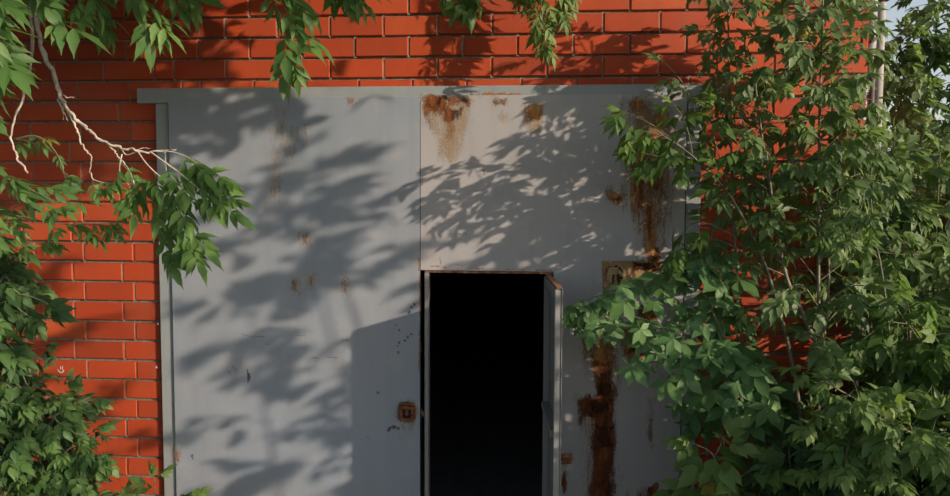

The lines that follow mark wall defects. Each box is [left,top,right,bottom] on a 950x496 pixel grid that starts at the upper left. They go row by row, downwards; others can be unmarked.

corrosion [422,92,521,128]
corrosion [524,104,543,121]
corrosion [606,98,676,263]
corrosion [638,305,657,338]
corrosion [577,328,645,496]